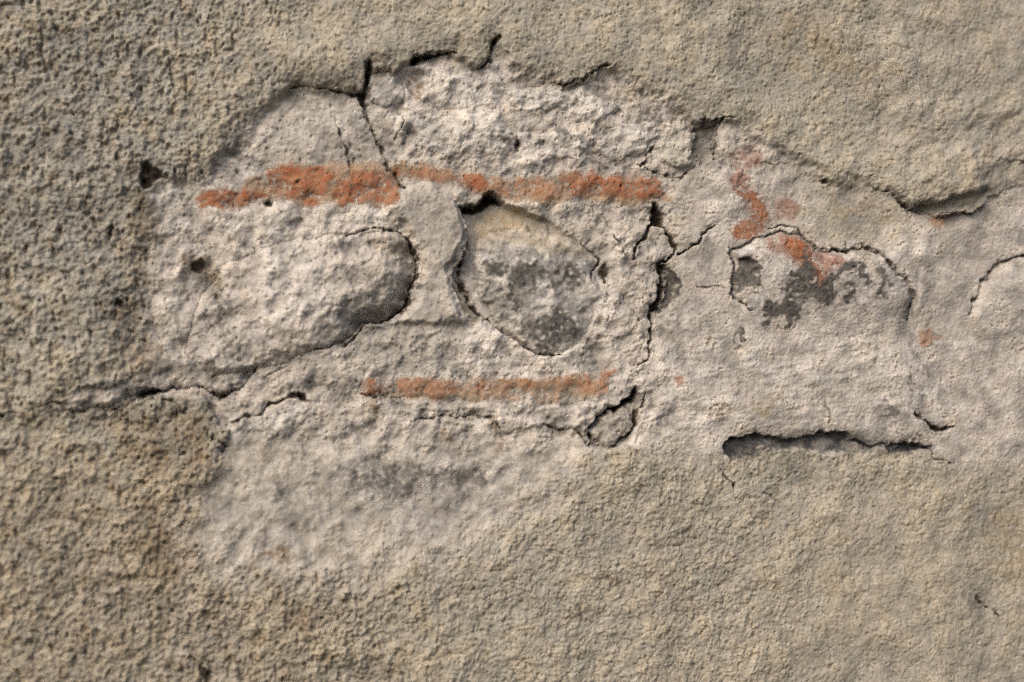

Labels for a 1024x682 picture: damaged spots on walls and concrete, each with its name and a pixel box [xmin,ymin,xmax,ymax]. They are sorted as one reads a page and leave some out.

crack [873,189,982,215]
spalling [62,41,1024,576]
crack [720,413,952,488]